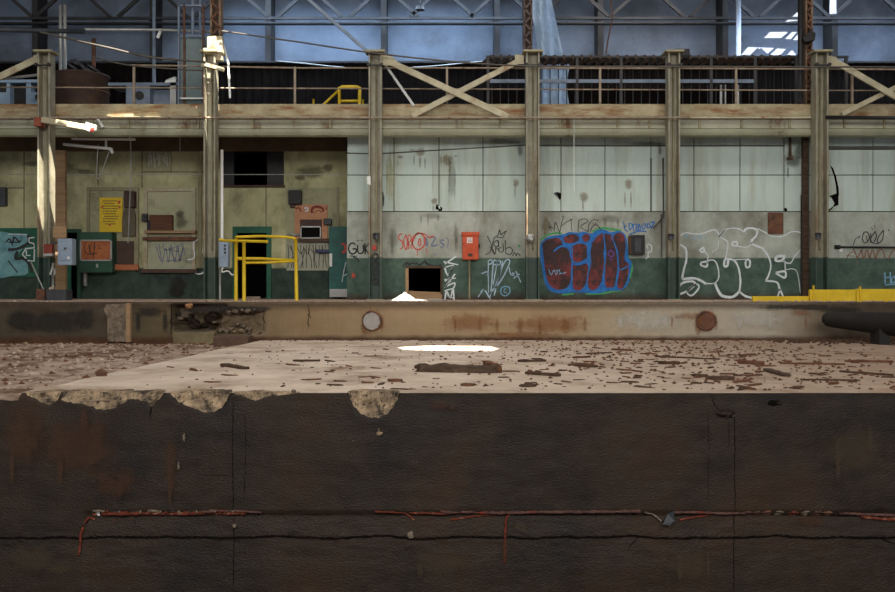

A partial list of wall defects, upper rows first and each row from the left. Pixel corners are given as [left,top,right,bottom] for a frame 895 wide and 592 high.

spalling [175,303,263,334]
spalling [25,389,300,412]
spalling [348,389,400,436]
crack [0,395,895,591]